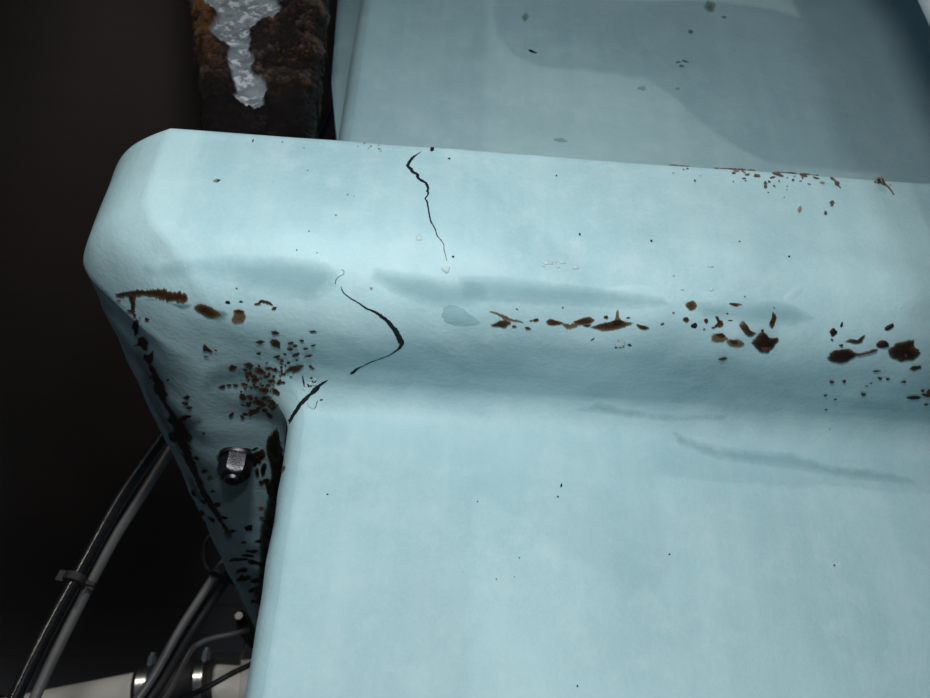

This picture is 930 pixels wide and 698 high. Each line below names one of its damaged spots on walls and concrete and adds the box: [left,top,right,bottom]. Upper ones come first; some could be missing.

crack [406,152,447,261]
corrosion [716,168,841,198]
corrosion [217,330,317,419]
crack [335,269,404,374]
corrosion [490,308,649,331]
corrosion [672,296,779,353]
corrosion [827,322,921,371]
corrosion [115,288,253,544]
crack [284,380,328,451]